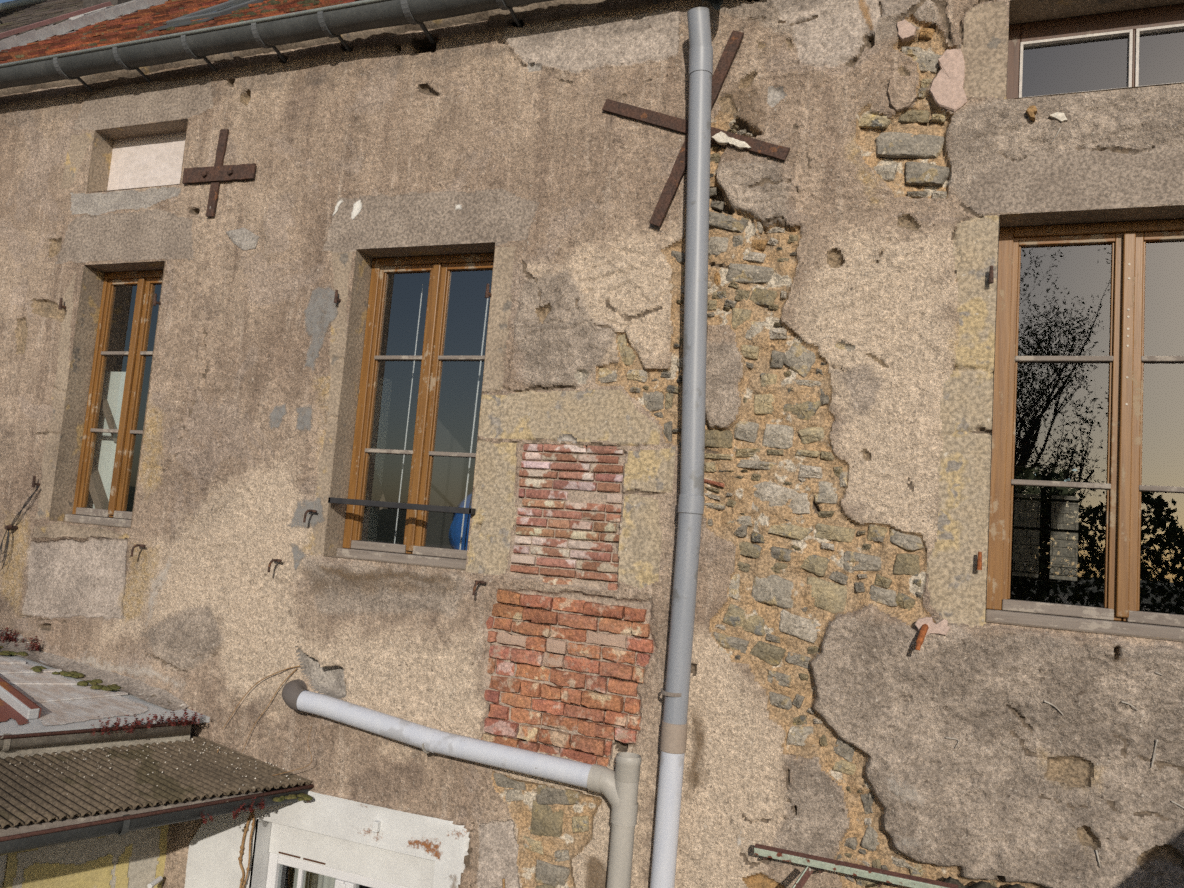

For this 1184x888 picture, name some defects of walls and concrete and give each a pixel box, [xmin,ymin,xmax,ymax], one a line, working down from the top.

spalling [855,14,967,199]
crack [521,259,541,324]
crack [575,299,663,334]
spalling [574,205,686,468]
spalling [703,71,1045,888]